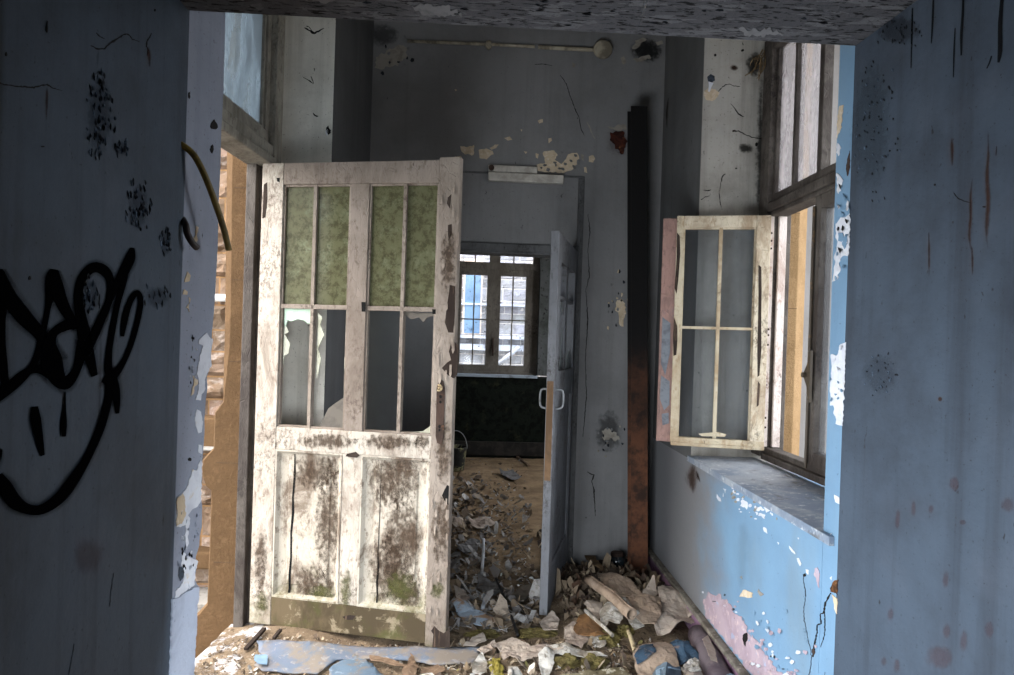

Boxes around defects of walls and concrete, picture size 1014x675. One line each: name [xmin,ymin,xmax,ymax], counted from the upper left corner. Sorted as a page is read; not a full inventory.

crack [91,32,152,66]
peeling [410,3,469,17]
peeling [739,17,784,37]
peeling [457,137,512,159]
peeling [524,138,595,173]
peeling [832,105,851,281]
peeling [189,333,213,433]
peeling [717,488,777,533]
peeling [169,445,203,675]
flaking render [777,537,839,614]
peeling [702,576,817,675]
crack [803,577,832,675]